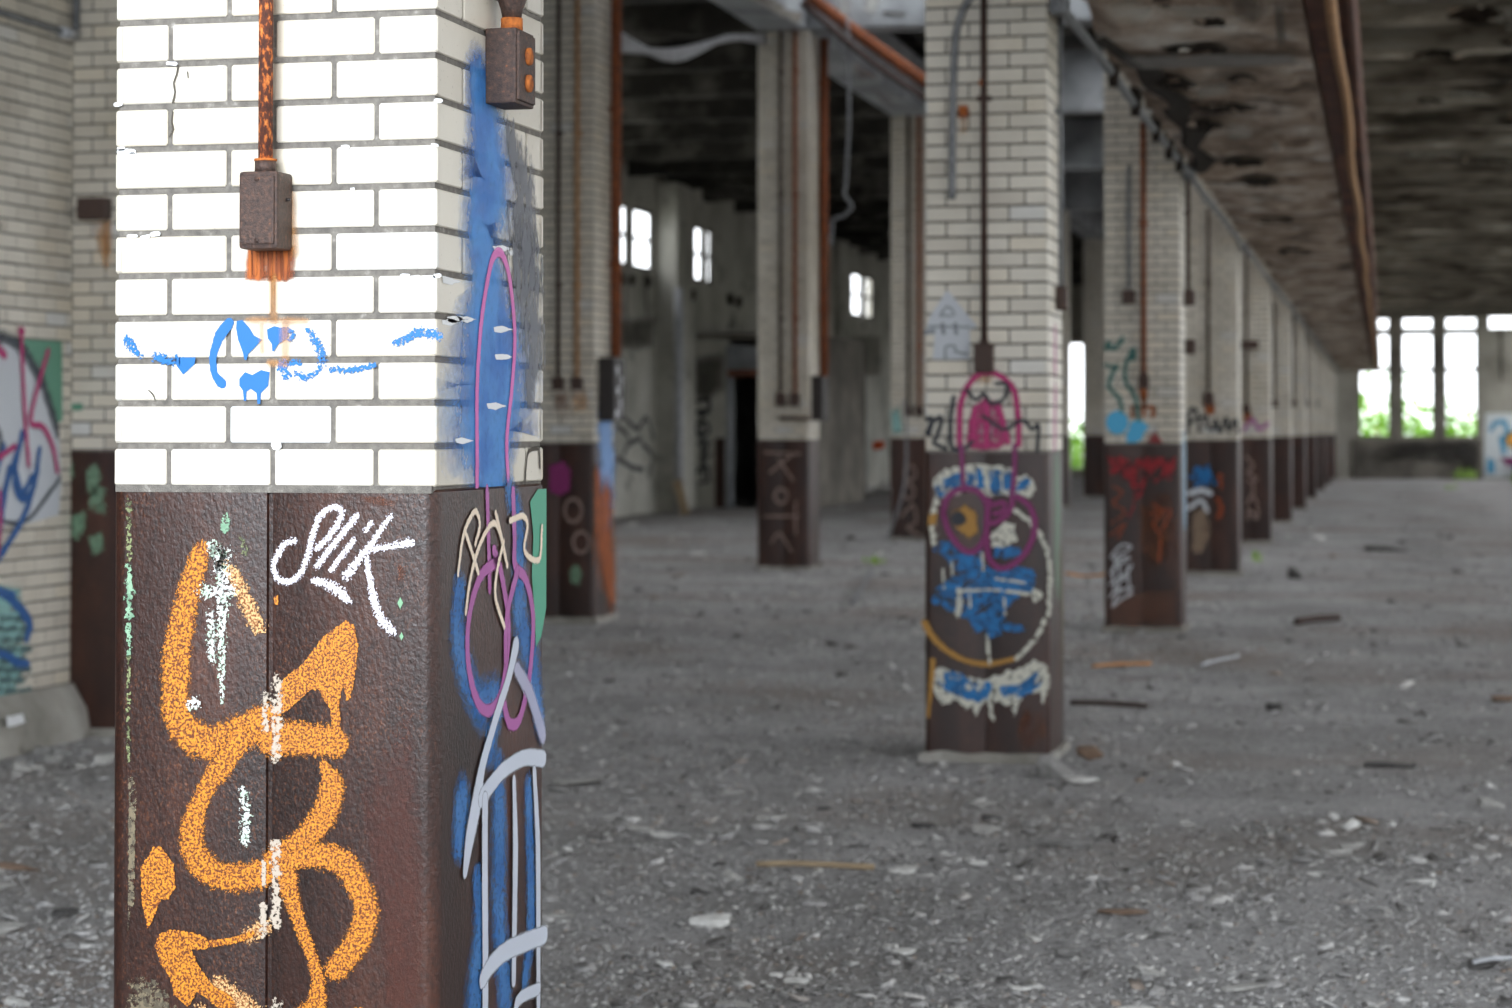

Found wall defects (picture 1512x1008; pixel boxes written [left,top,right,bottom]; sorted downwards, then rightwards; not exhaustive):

damp [1387,113,1458,140]
rust [246,247,294,282]
rust [128,777,136,927]
rust [126,977,176,1008]